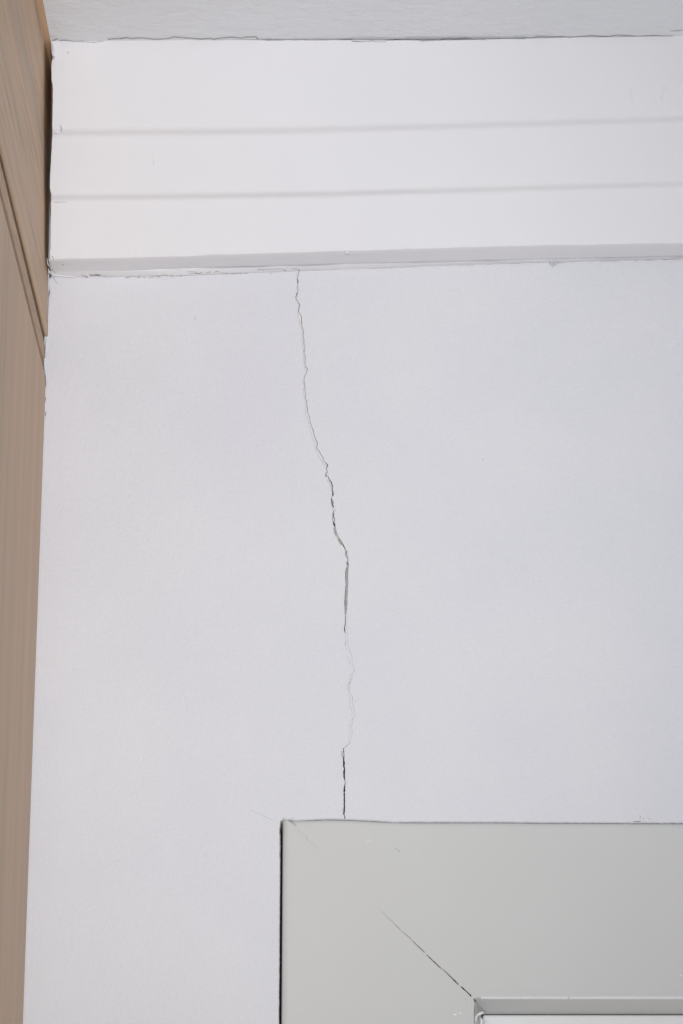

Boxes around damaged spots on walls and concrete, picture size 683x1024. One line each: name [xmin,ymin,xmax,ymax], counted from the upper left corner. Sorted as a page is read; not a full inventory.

crack [44,256,355,819]